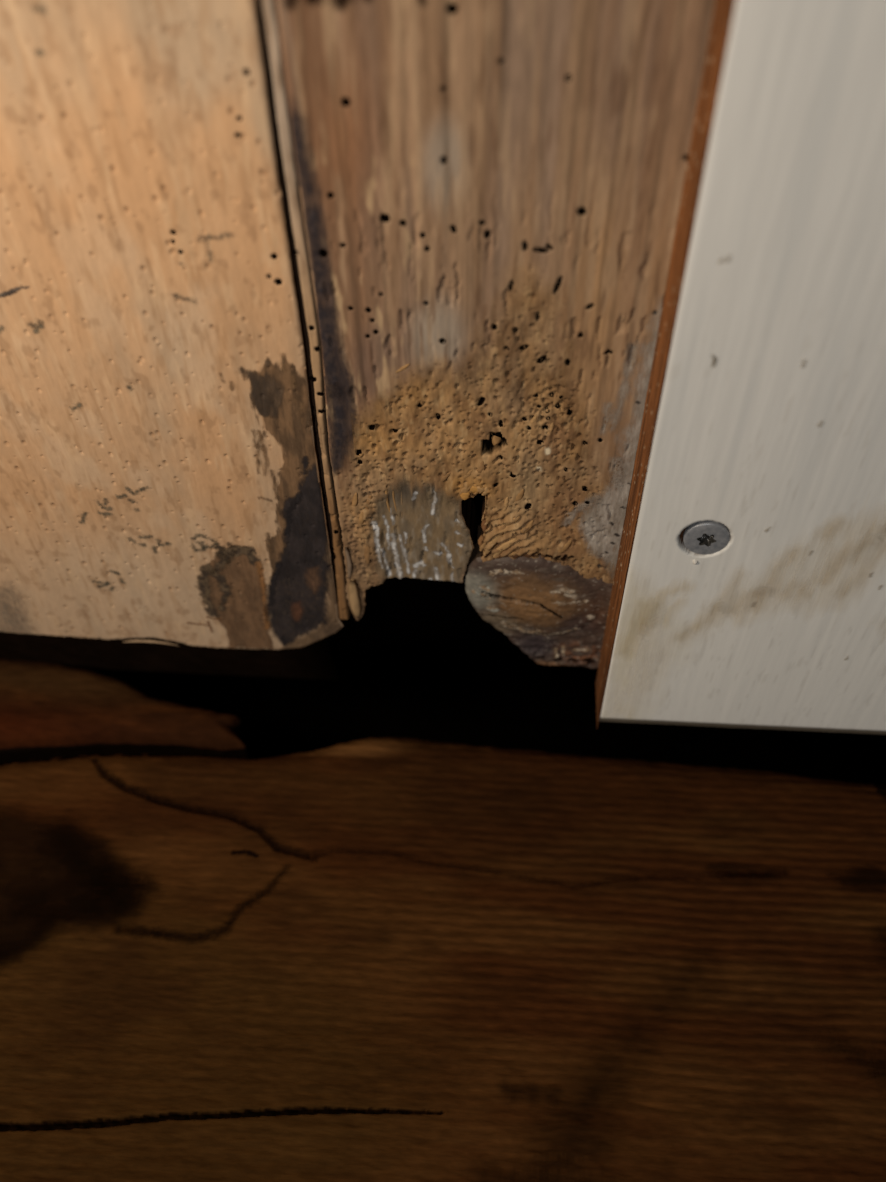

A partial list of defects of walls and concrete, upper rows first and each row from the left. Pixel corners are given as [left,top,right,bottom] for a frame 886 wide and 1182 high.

damp [291,117,356,472]
damp [266,456,342,649]
peeling [345,547,362,619]
spalling [460,432,507,500]
peeling [478,489,524,562]
damp [0,816,146,960]
crack [0,754,354,941]
crack [0,1107,442,1131]